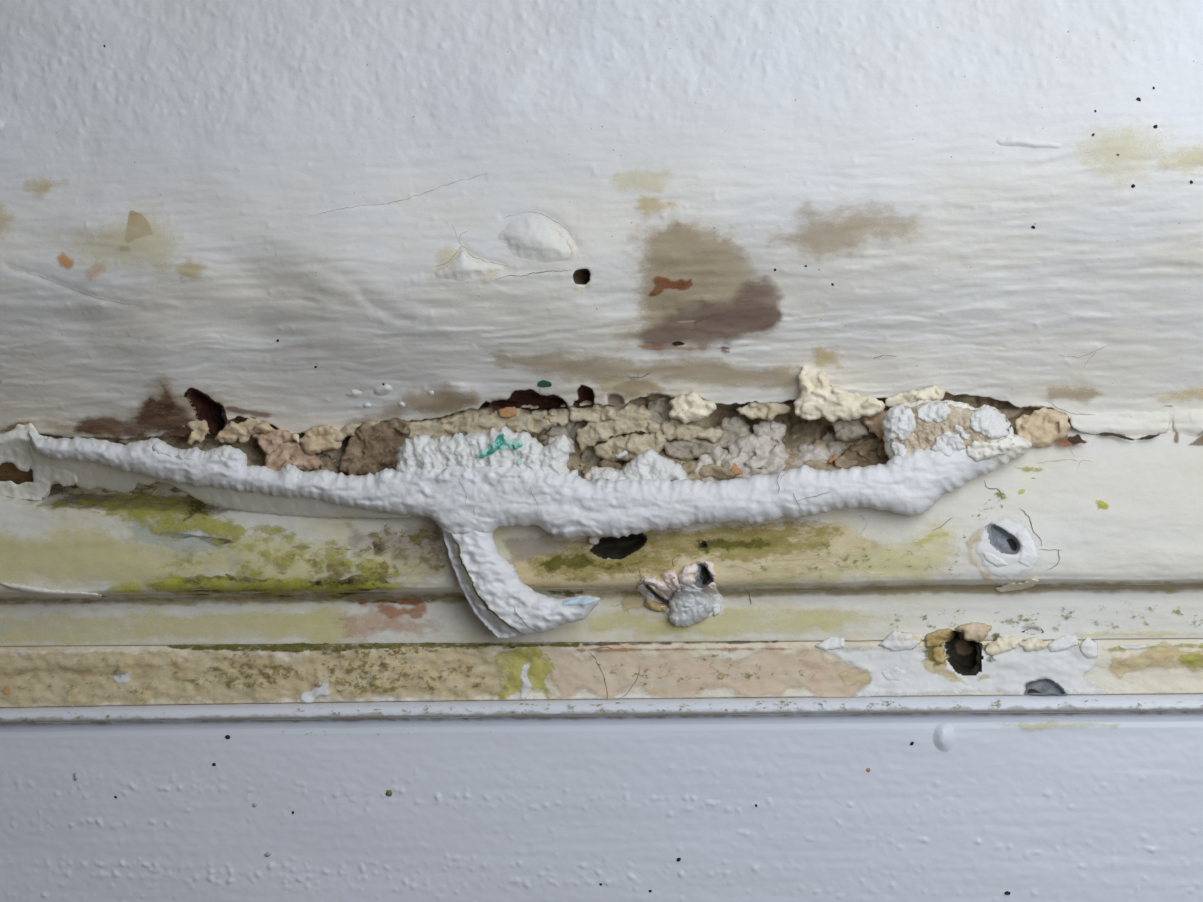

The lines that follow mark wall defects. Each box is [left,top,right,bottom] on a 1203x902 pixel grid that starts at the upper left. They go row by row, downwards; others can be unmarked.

water stain [499,227,791,398]
water stain [817,350,836,365]
spalling [0,366,1203,501]
water stain [353,527,441,573]
spalling [897,622,1049,664]